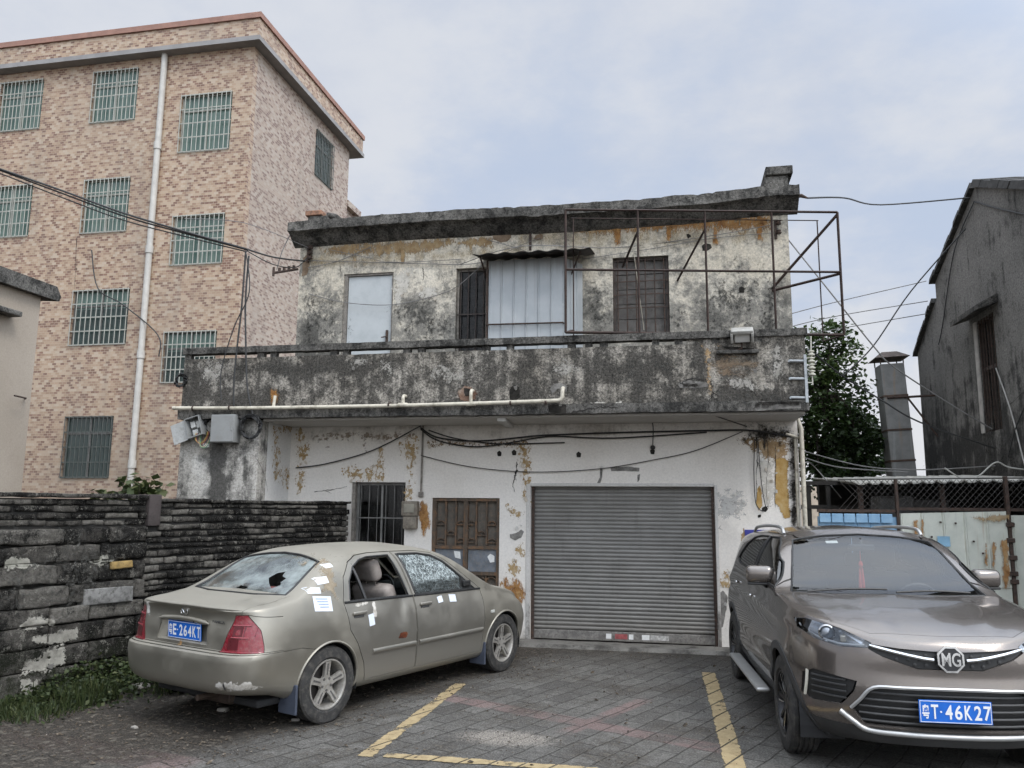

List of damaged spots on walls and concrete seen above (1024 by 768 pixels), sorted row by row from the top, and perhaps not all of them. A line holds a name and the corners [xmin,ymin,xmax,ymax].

damp [315,214,492,267]
rust [581,216,771,245]
damp [696,265,775,330]
damp [429,364,464,386]
peeling [341,447,384,483]
spalling [714,436,791,520]
peeling [399,436,533,577]
damp [20,678,41,695]